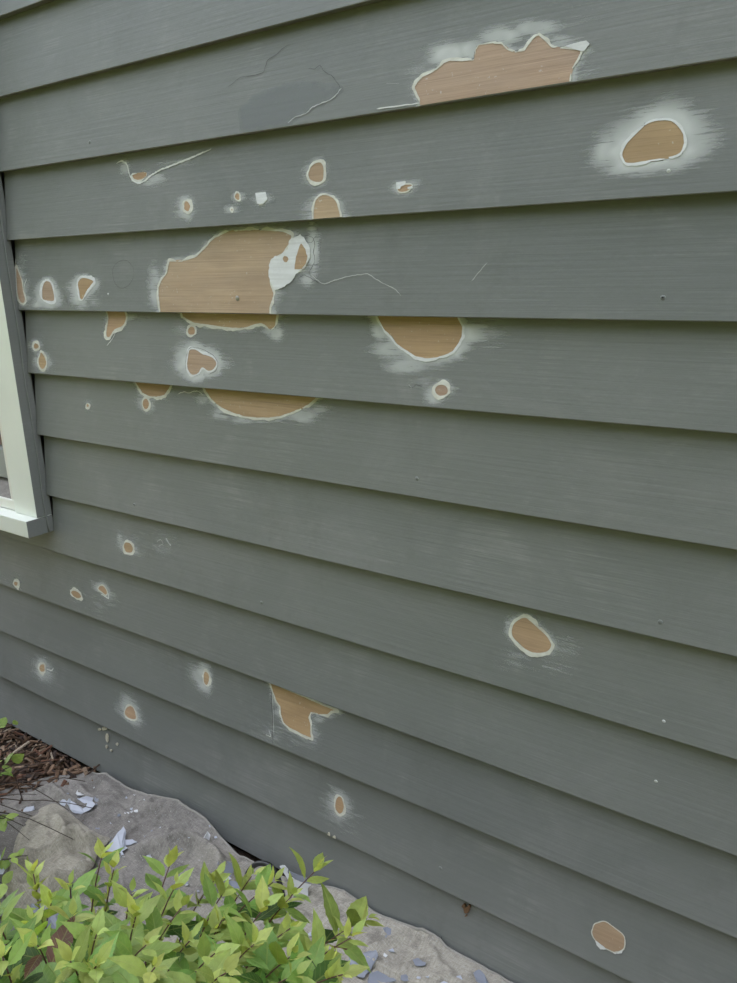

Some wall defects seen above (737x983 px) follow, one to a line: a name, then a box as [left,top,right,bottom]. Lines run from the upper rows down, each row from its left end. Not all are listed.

peeling [377,20,589,109]
crack [288,66,340,123]
peeling [591,101,714,176]
peeling [15,260,100,309]
peeling [132,159,348,424]
peeling [103,312,136,344]
peeling [368,316,488,373]
peeling [410,379,453,404]
peeling [505,614,558,657]
peeling [267,682,343,741]
peeling [591,921,626,954]